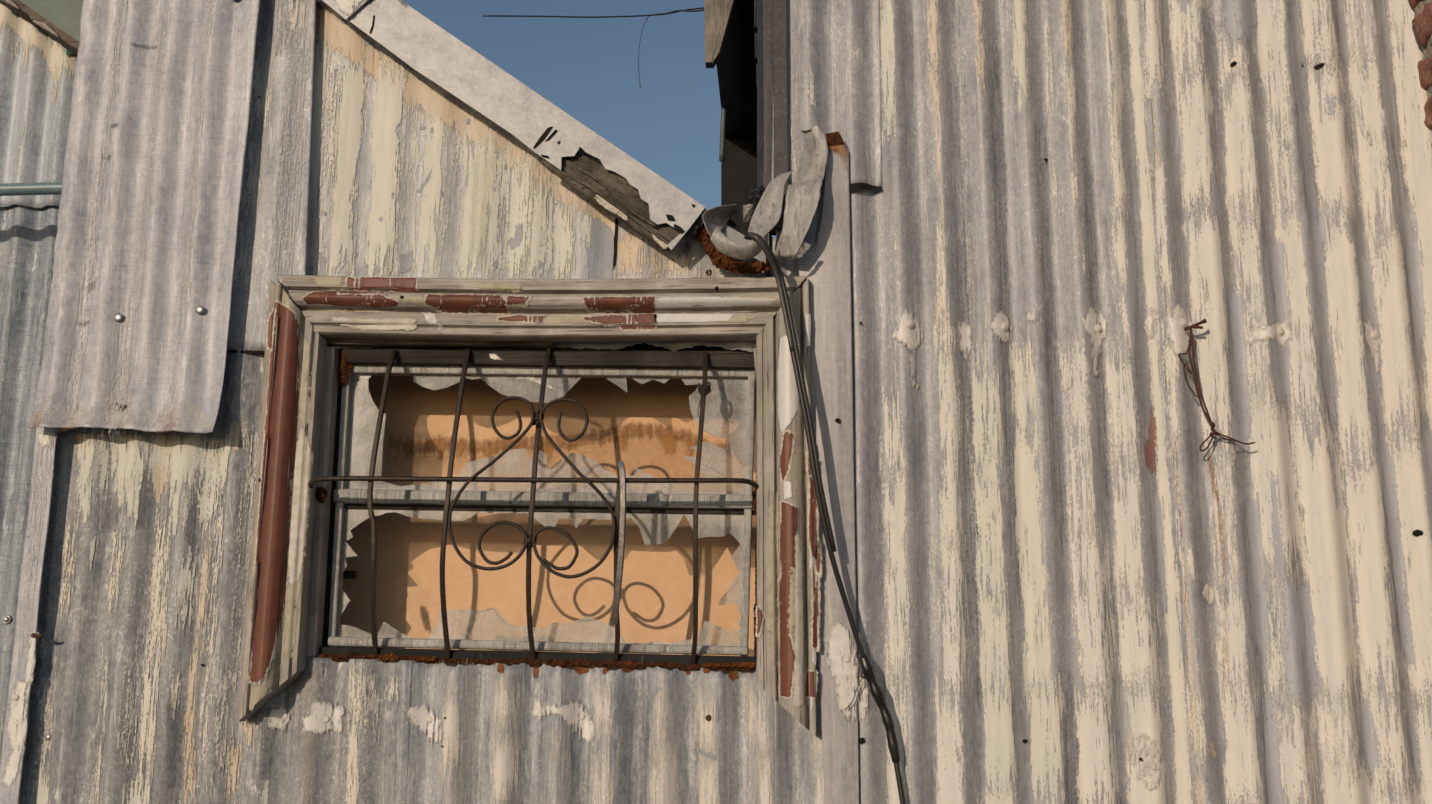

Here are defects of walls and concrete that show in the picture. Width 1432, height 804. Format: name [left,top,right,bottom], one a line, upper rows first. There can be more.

peeling [2,431,55,804]
peeling [59,0,795,804]
rust [310,471,757,671]
rust [696,223,772,274]
peeling [742,314,825,804]
peeling [789,50,816,172]
peeling [878,0,1432,804]